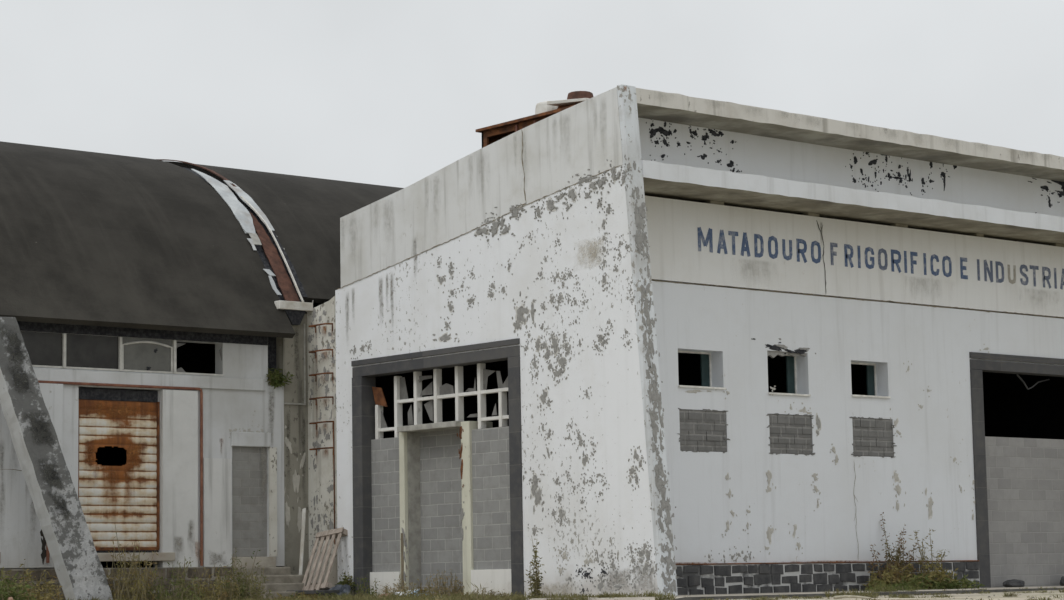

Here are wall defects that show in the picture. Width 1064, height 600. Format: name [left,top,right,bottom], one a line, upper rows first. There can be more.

corrosion [156,159,237,187]
peeling [646,119,742,173]
peeling [845,152,957,195]
peeling [1028,178,1064,208]
corrosion [249,212,300,302]
damp [1,326,29,392]
peeling [432,155,679,596]
peeling [229,300,337,553]
damp [41,460,70,518]
peeling [704,472,776,565]